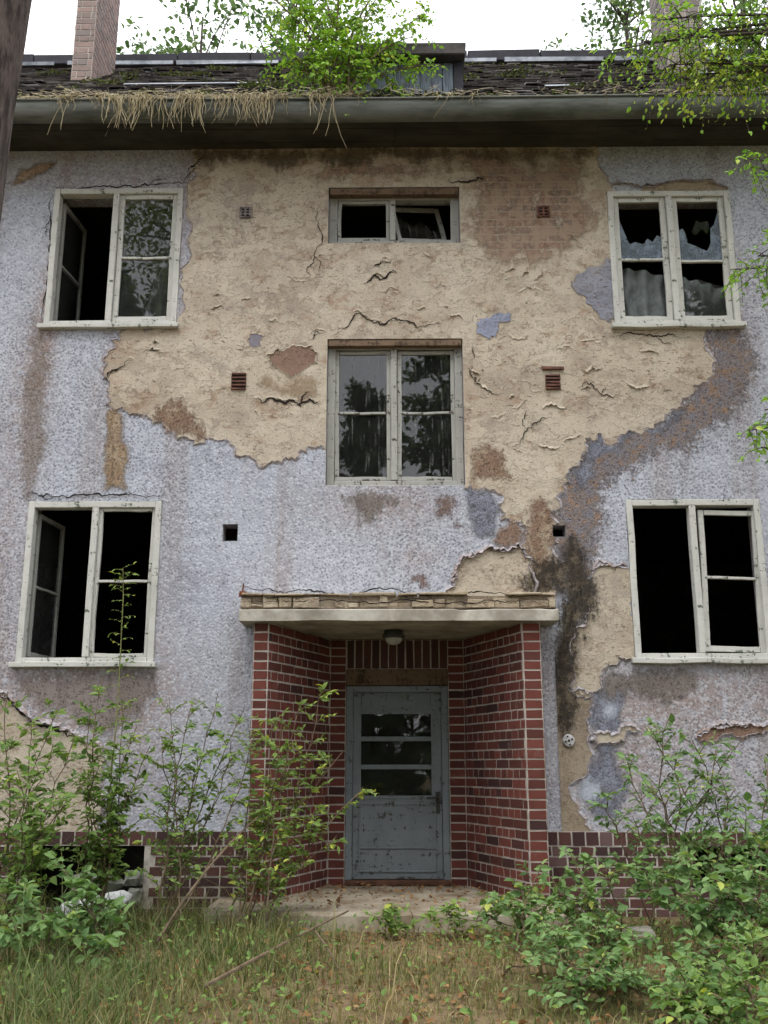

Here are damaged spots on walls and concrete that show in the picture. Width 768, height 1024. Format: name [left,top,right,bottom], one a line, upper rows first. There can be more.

crack [41,159,201,319]
crack [366,261,396,283]
crack [311,313,443,340]
peeling [99,146,730,597]
crack [579,381,620,398]
crack [515,412,551,446]
crack [23,491,163,500]
damp [436,329,765,737]
crack [237,587,550,605]
peeling [556,558,641,831]
crack [0,695,74,737]
spalling [693,719,768,745]